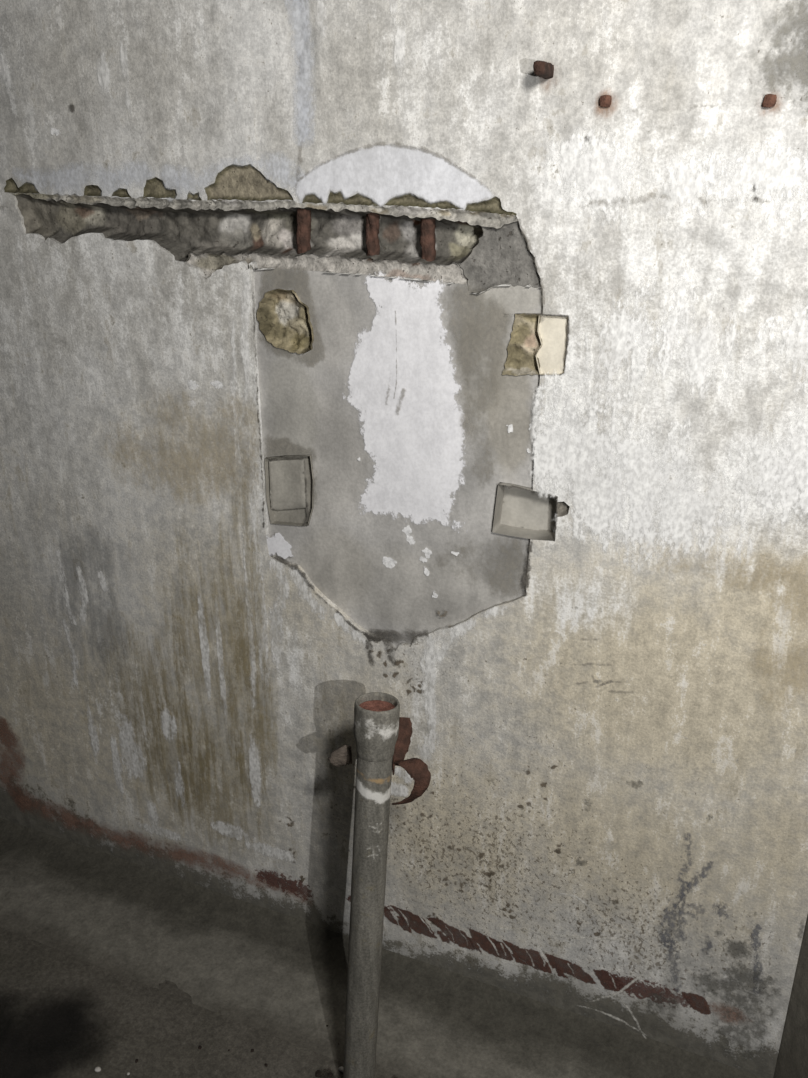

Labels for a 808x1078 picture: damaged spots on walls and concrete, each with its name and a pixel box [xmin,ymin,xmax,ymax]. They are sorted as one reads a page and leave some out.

rust [296,208,311,256]
rust [365,212,380,262]
rust [420,218,436,261]
spalling [4,164,542,576]
flaking render [370,638,424,694]
water stain [660,862,712,977]
water stain [694,925,776,1011]